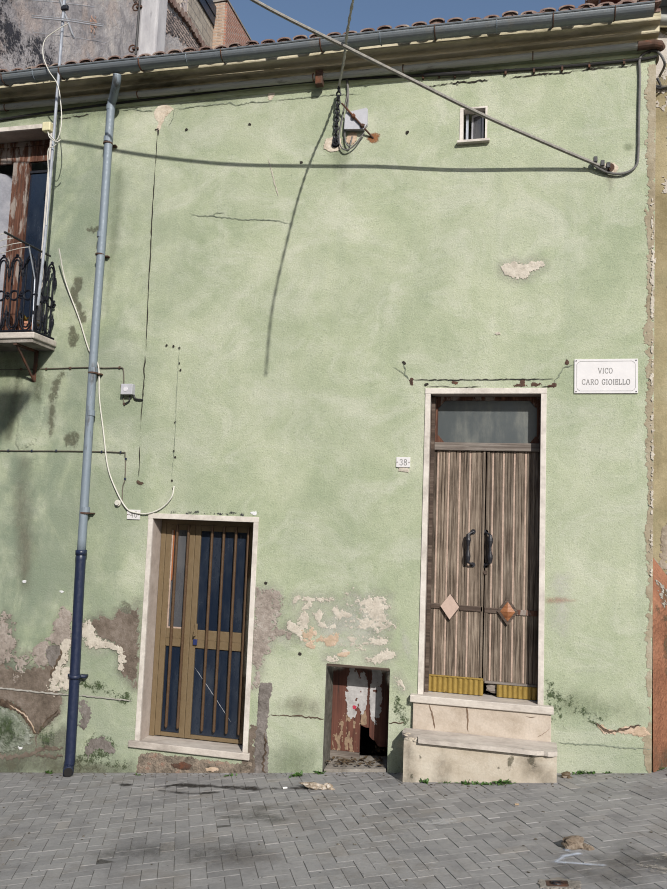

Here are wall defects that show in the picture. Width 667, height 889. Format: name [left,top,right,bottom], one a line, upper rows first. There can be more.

crack [126,94,347,121]
crack [429,79,487,87]
crack [513,64,637,78]
peeling [656,32,667,112]
crack [192,212,290,224]
peeling [501,261,545,280]
crack [141,142,181,490]
peeling [596,341,667,773]
peeling [0,606,72,761]
peeling [92,608,140,689]
peeling [251,581,399,690]
crack [526,716,651,750]